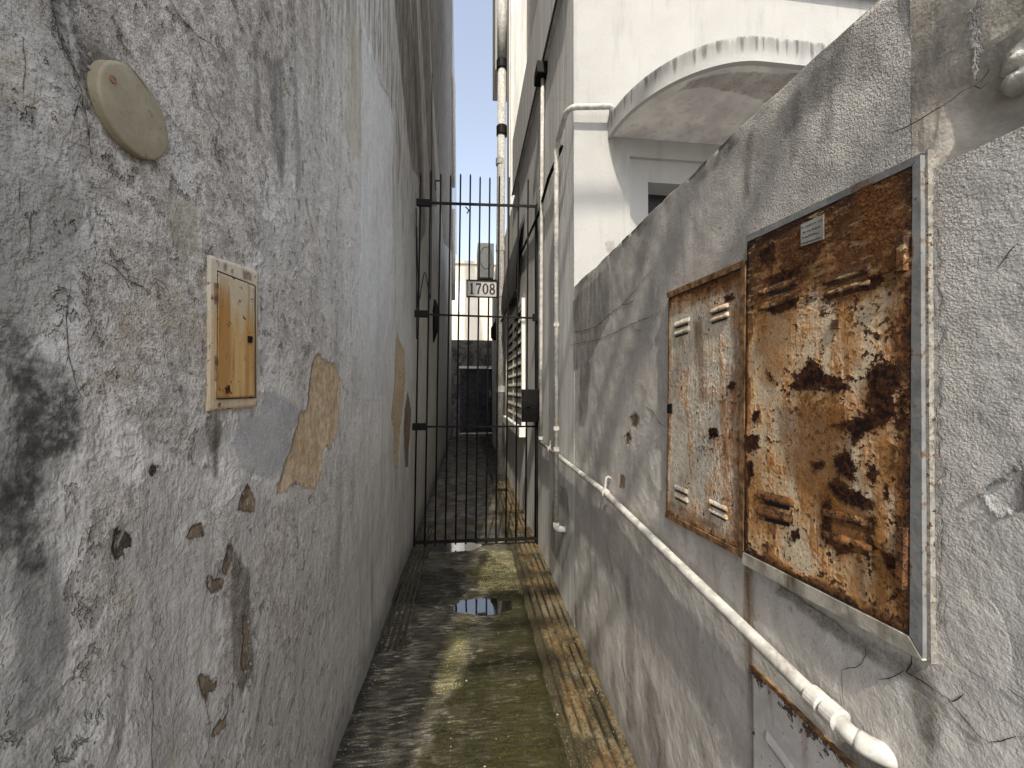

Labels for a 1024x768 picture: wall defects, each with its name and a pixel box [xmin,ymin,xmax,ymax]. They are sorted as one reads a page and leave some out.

crack [890,69,989,134]
water stain [0,331,79,574]
spalling [276,353,341,494]
spalling [391,335,411,468]
spalling [623,414,639,444]
spalling [238,483,255,513]
spalling [112,525,135,560]
spalling [186,522,205,539]
spalling [207,540,233,594]
spalling [198,673,218,708]
crack [841,645,866,705]
crack [884,656,1020,742]